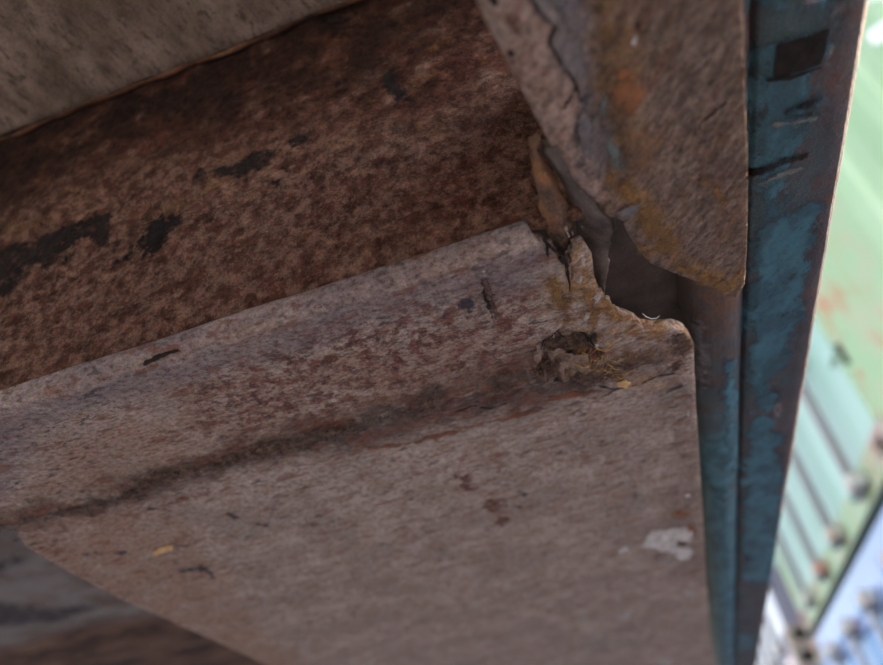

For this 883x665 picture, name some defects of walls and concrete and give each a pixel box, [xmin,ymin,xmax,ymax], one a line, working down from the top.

damp [0,204,182,297]
crack [542,238,571,292]
rust [529,134,594,372]
spalling [529,329,605,382]
rust [668,333,692,371]